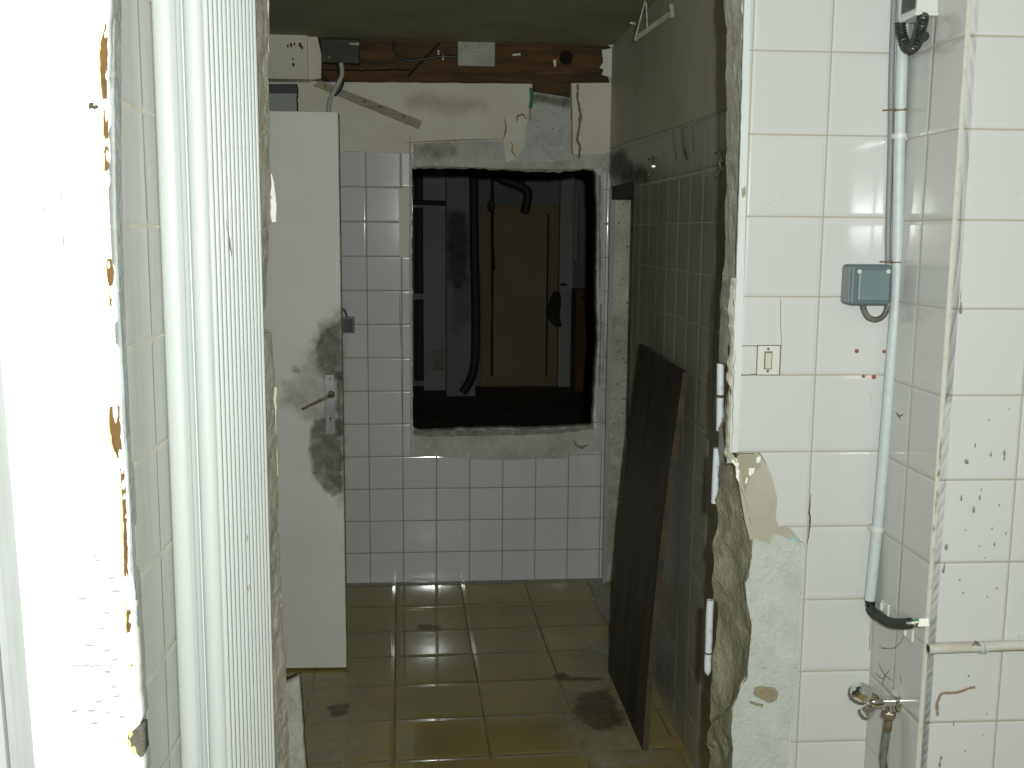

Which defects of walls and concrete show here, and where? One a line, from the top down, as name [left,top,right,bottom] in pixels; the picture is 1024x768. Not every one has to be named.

flaking render [517,93,572,161]
crack [570,84,582,159]
peeling [706,278,805,768]
rust [935,686,975,716]